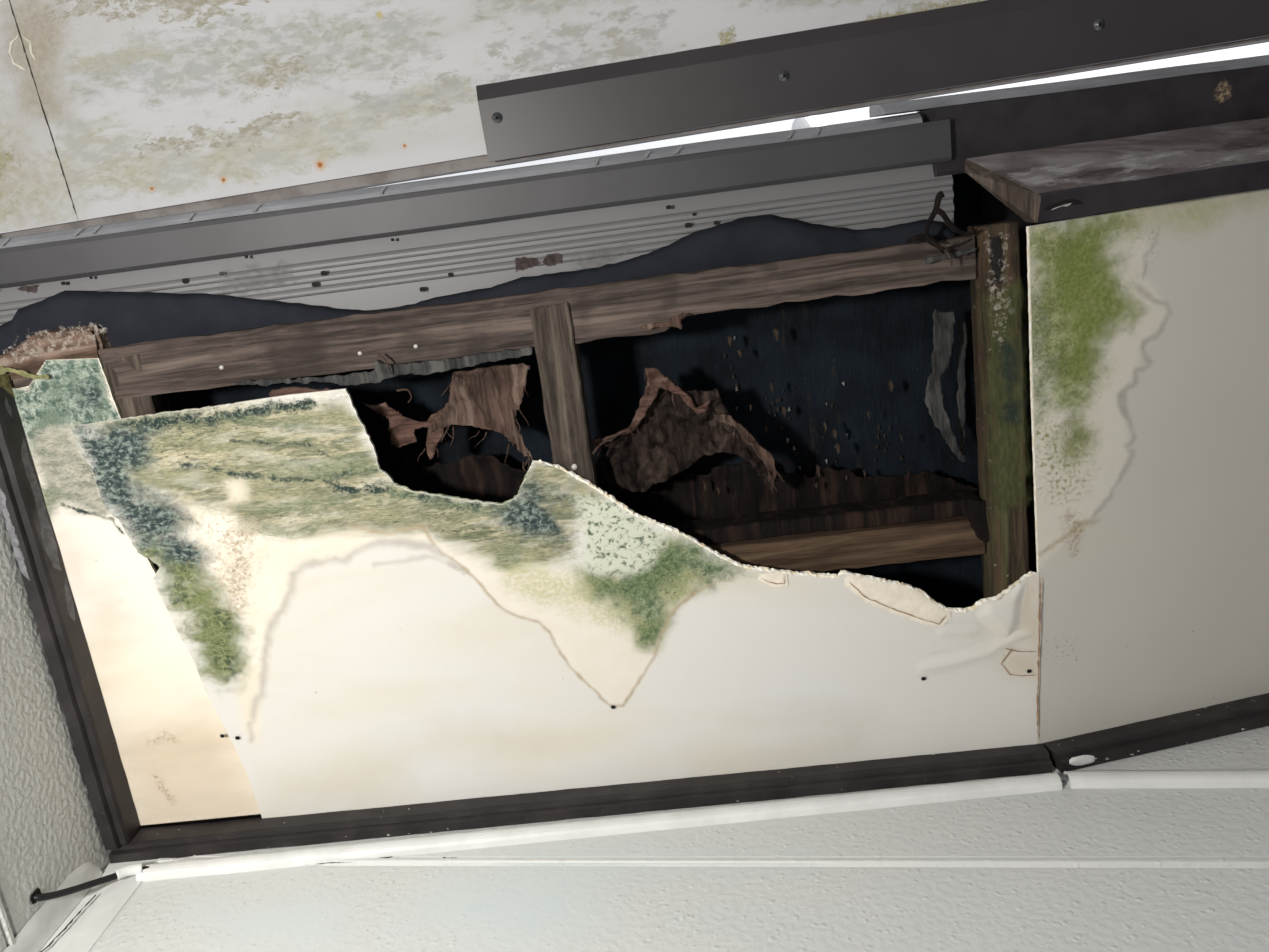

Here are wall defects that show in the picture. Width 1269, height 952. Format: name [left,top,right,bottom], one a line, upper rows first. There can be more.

water stain [0,0,685,246]
water stain [716,0,983,46]
peeling [514,252,563,272]
spalling [983,231,1011,351]
water stain [991,189,1269,685]
water stain [12,358,761,826]